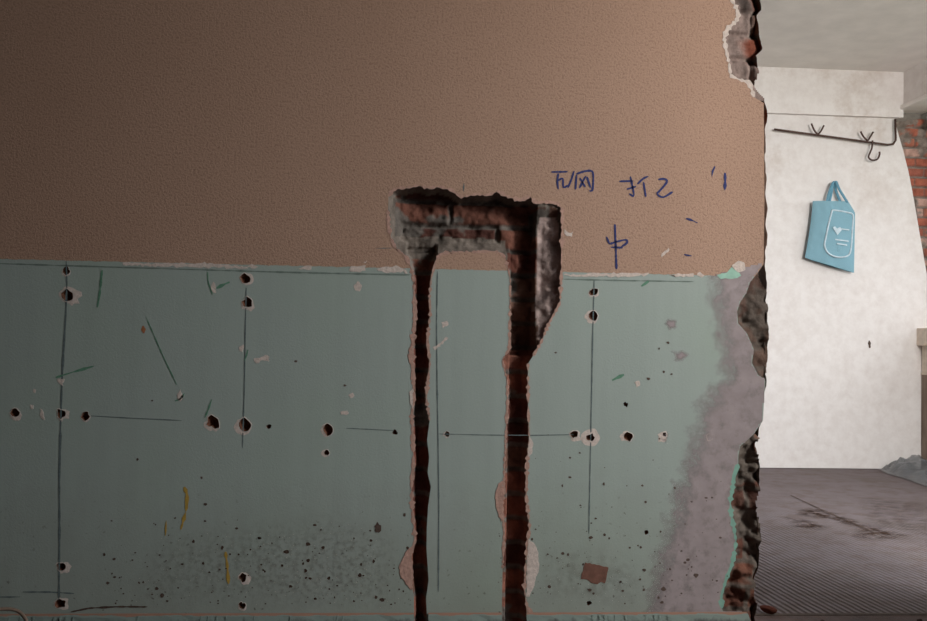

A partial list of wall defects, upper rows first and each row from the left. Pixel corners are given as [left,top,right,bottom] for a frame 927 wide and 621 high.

peeling [123,262,258,285]
spalling [377,184,649,621]
peeling [651,261,769,621]
spalling [896,119,927,272]